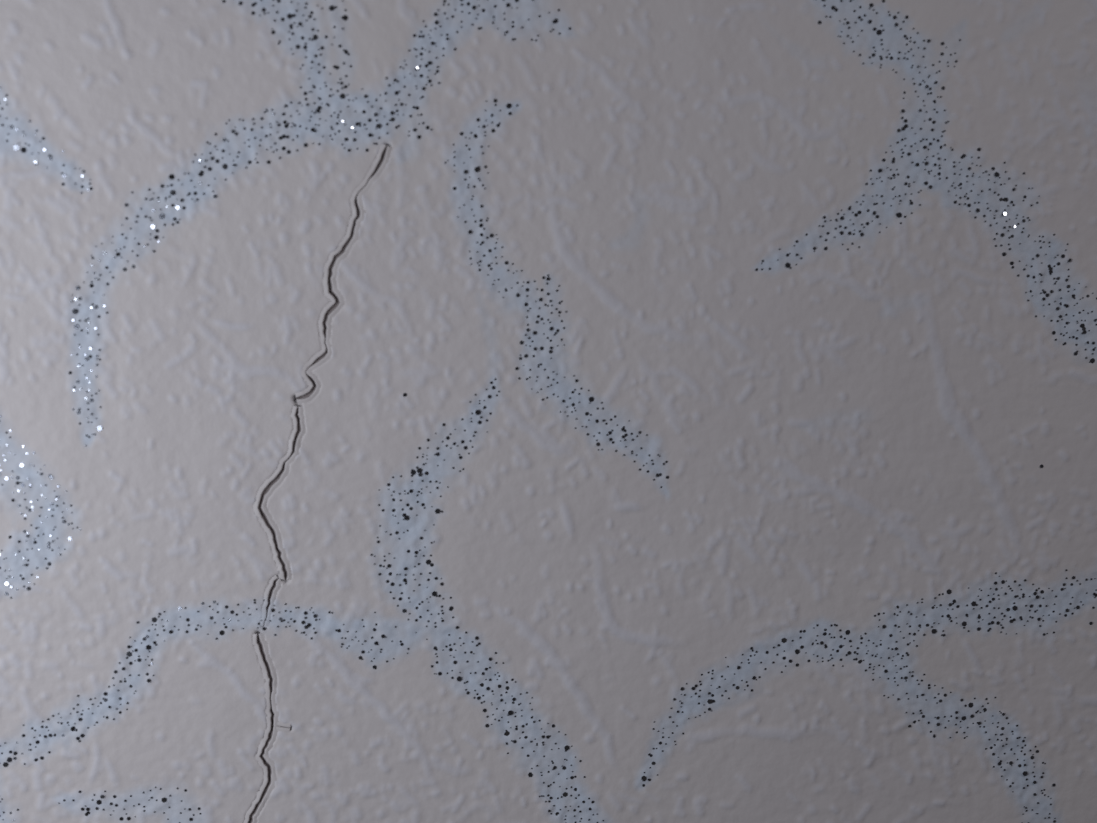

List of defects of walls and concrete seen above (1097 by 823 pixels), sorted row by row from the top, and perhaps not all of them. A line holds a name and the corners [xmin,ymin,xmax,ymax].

crack [244,144,393,823]